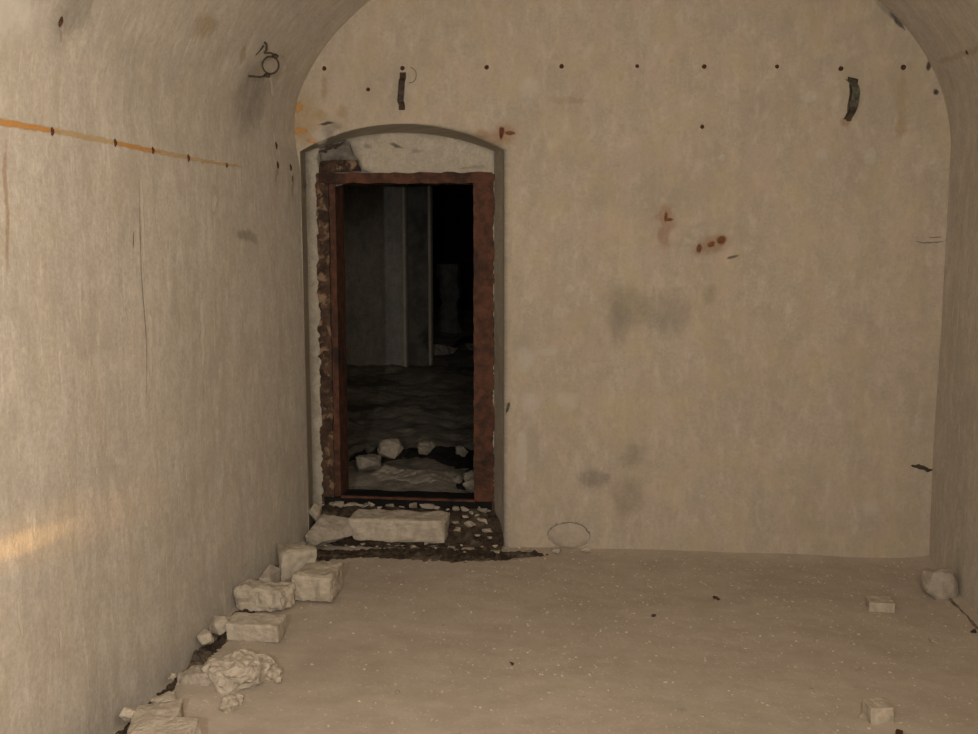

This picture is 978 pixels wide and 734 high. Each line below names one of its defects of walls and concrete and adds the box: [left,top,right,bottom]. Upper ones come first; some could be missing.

corrosion [0,119,236,166]